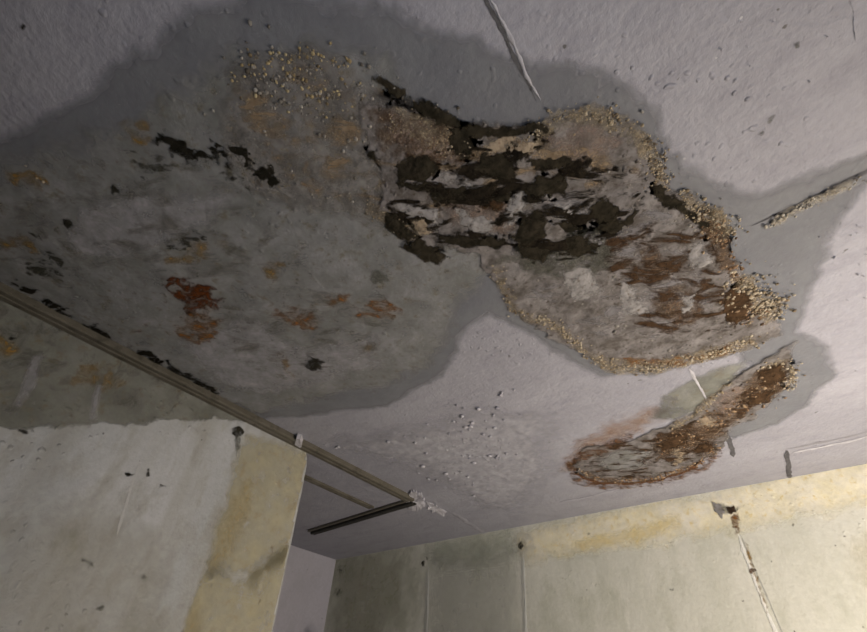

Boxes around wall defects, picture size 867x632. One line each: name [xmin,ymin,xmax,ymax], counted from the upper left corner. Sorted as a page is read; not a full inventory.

crack [484,0,541,101]
leakage [0,0,867,437]
spalling [203,41,797,376]
rust [165,277,222,345]
spalling [567,341,806,490]
leakage [184,437,306,632]
leakage [433,464,867,561]
crack [737,531,783,632]